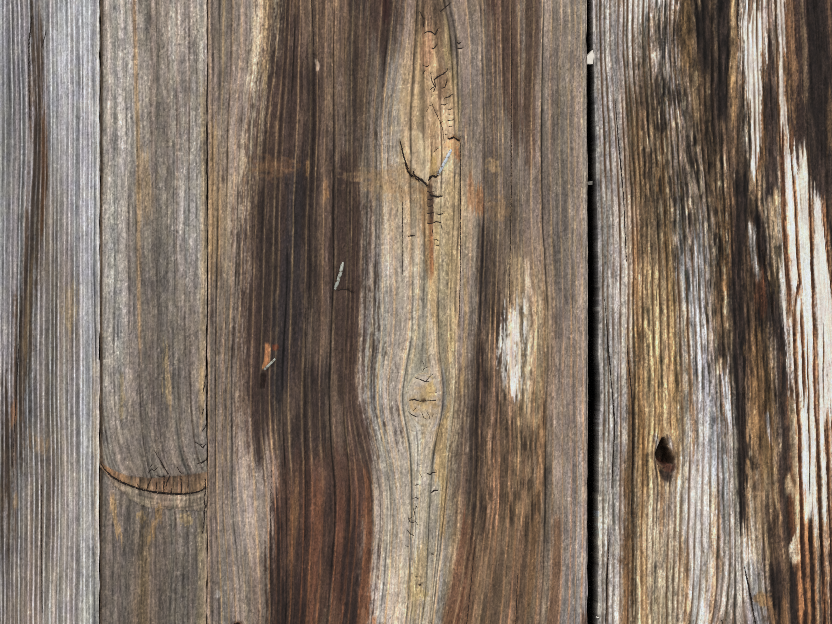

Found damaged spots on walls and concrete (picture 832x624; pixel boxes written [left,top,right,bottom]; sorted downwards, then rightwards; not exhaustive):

crack [400,3,461,318]
crack [101,376,206,533]